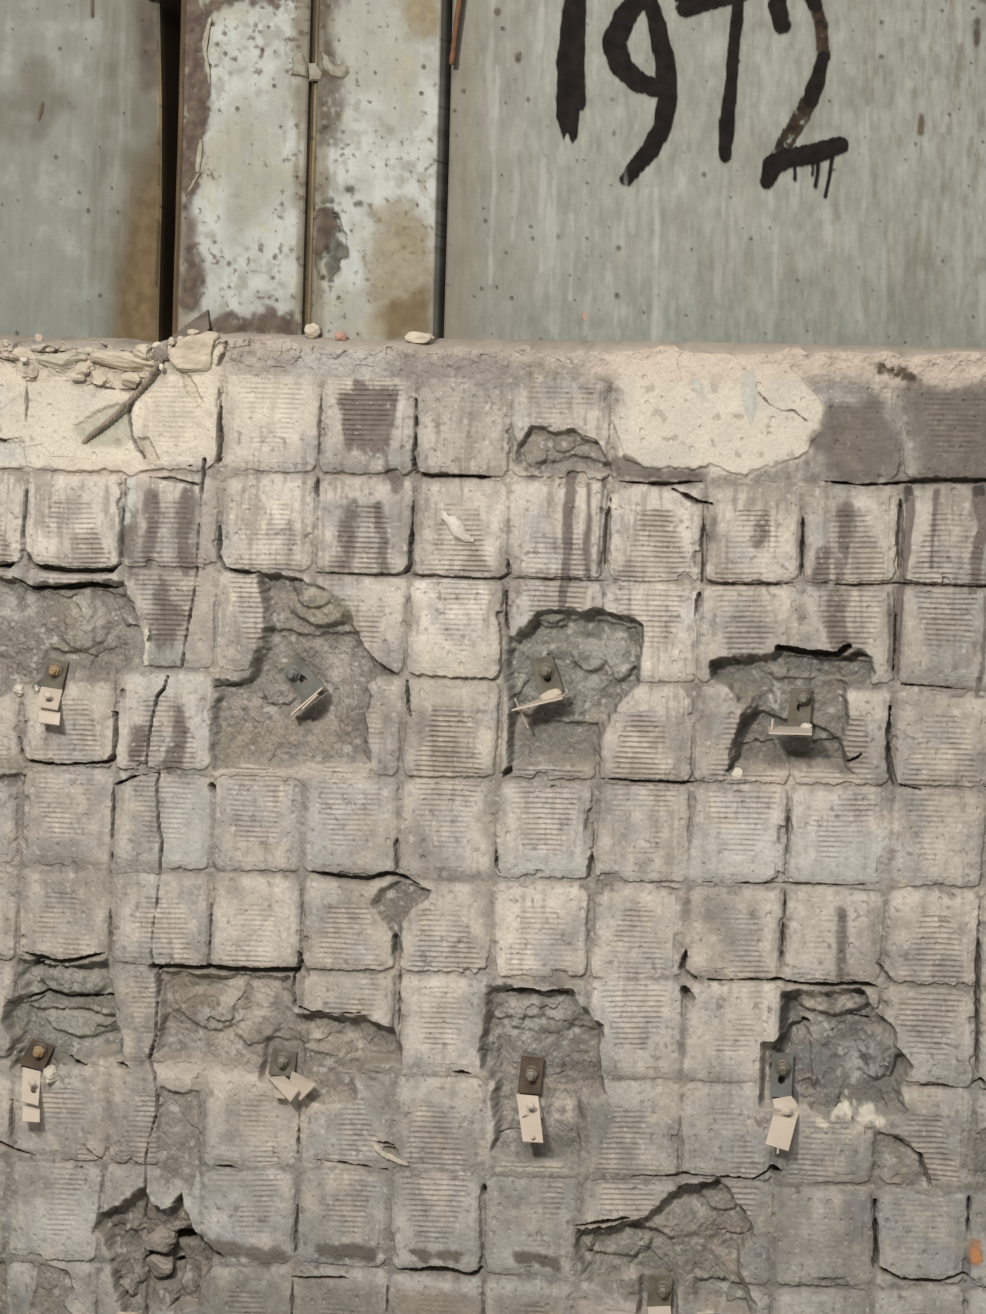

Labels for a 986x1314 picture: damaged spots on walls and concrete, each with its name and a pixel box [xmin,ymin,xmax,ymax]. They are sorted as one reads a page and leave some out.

leakage [180,0,281,208]
leakage [179,243,204,310]
leakage [209,306,301,335]
leakage [315,185,362,282]
spalling [0,576,145,698]
spalling [208,570,401,773]
spalling [502,607,645,773]
spalling [708,645,878,778]
crack [143,406,224,1314]
spalling [153,964,404,1107]
spalling [476,982,609,1164]
spalling [765,981,929,1193]